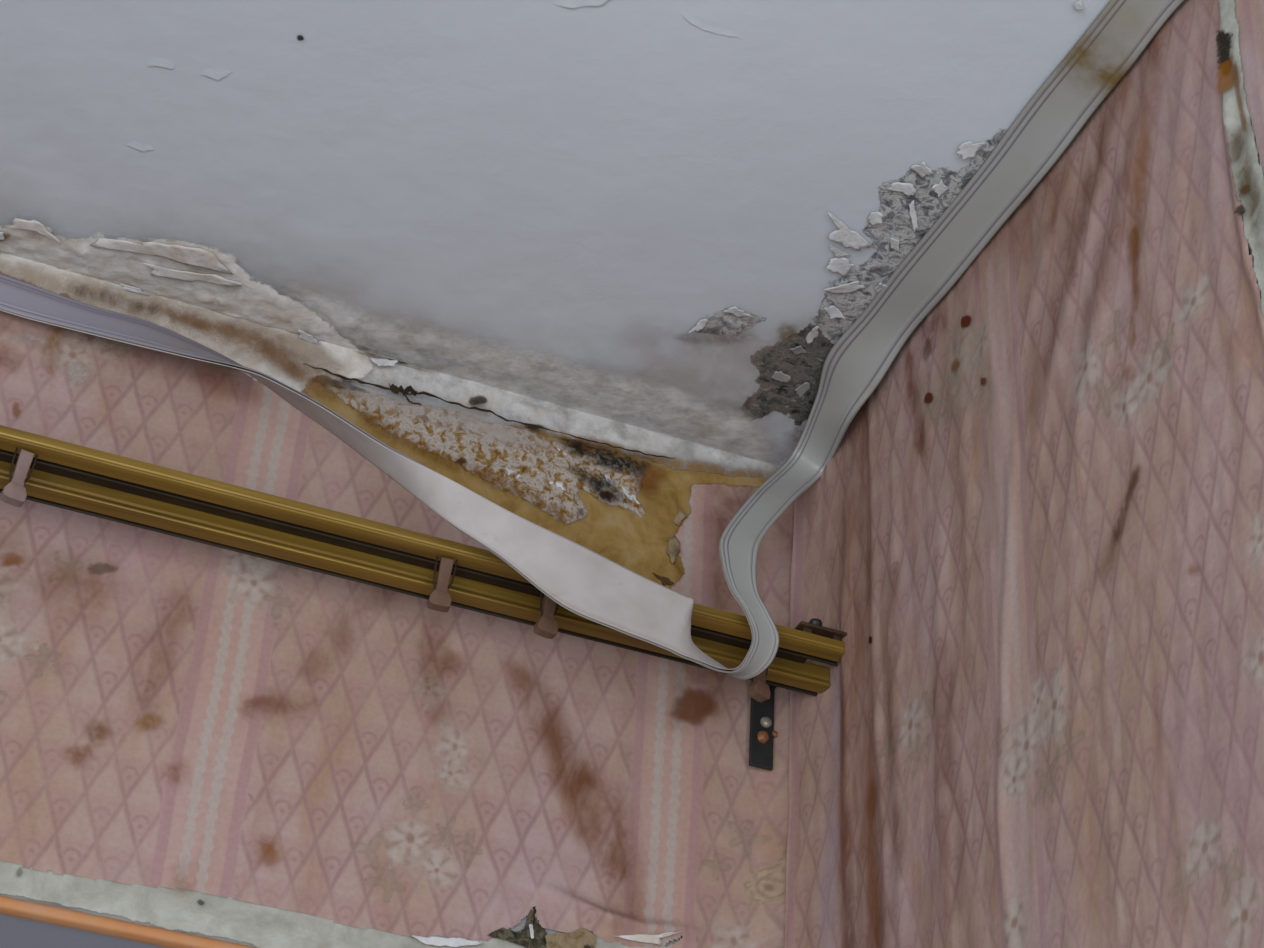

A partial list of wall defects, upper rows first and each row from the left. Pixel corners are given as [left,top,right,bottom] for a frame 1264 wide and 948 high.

peeling [0,129,1007,589]
leakage [469,396,487,405]
leakage [562,438,658,501]
leakage [1126,469,1138,501]
leakage [676,691,713,722]
peeling [0,860,683,948]